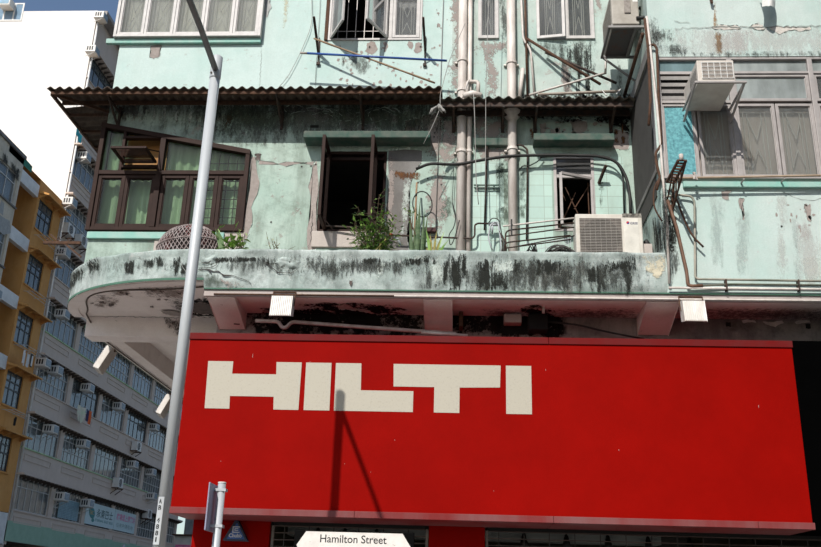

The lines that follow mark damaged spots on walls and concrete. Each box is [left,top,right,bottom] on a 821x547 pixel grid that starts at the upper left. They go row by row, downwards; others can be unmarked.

peeling [337,41,441,87]
leakage [522,44,630,99]
leakage [100,105,206,132]
leakage [526,116,630,134]
leakage [213,105,457,240]
leakage [307,180,678,296]
leakage [69,257,187,294]
leakage [208,256,291,289]
leakage [803,257,821,280]
leakage [146,286,183,309]